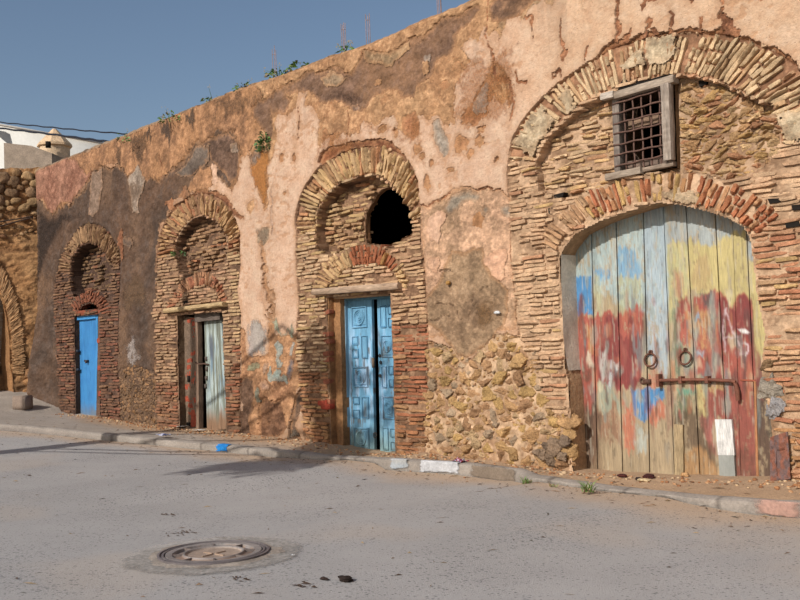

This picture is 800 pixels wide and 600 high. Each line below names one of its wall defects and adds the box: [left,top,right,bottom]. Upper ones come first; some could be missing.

crack [614,0,675,43]
crack [690,0,741,38]
flaking render [599,27,727,70]
spalling [738,36,798,66]
flaking render [777,110,800,141]
flaking render [661,187,701,205]
spalling [26,0,554,439]